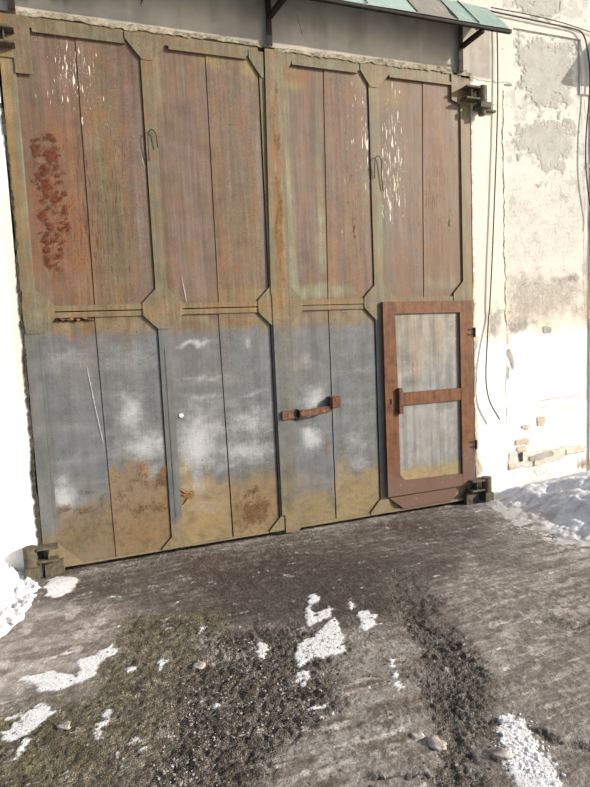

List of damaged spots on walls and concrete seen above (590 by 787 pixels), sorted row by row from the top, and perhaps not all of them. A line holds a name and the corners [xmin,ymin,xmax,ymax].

peeling [508,29,580,174]
corrosion [31,133,71,274]
leakage [491,275,578,336]
spalling [508,416,588,470]